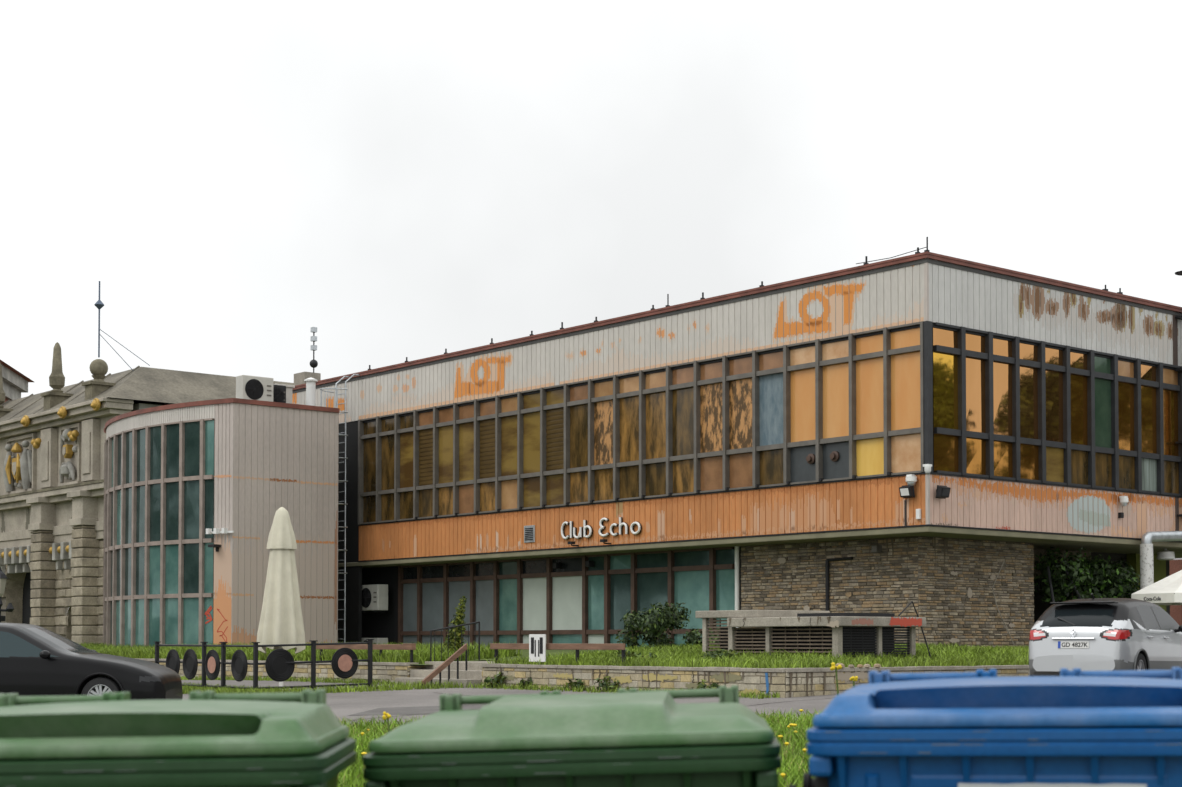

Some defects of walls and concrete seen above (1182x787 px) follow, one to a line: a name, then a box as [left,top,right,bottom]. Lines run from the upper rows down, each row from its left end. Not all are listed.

rust [1019,283,1173,340]